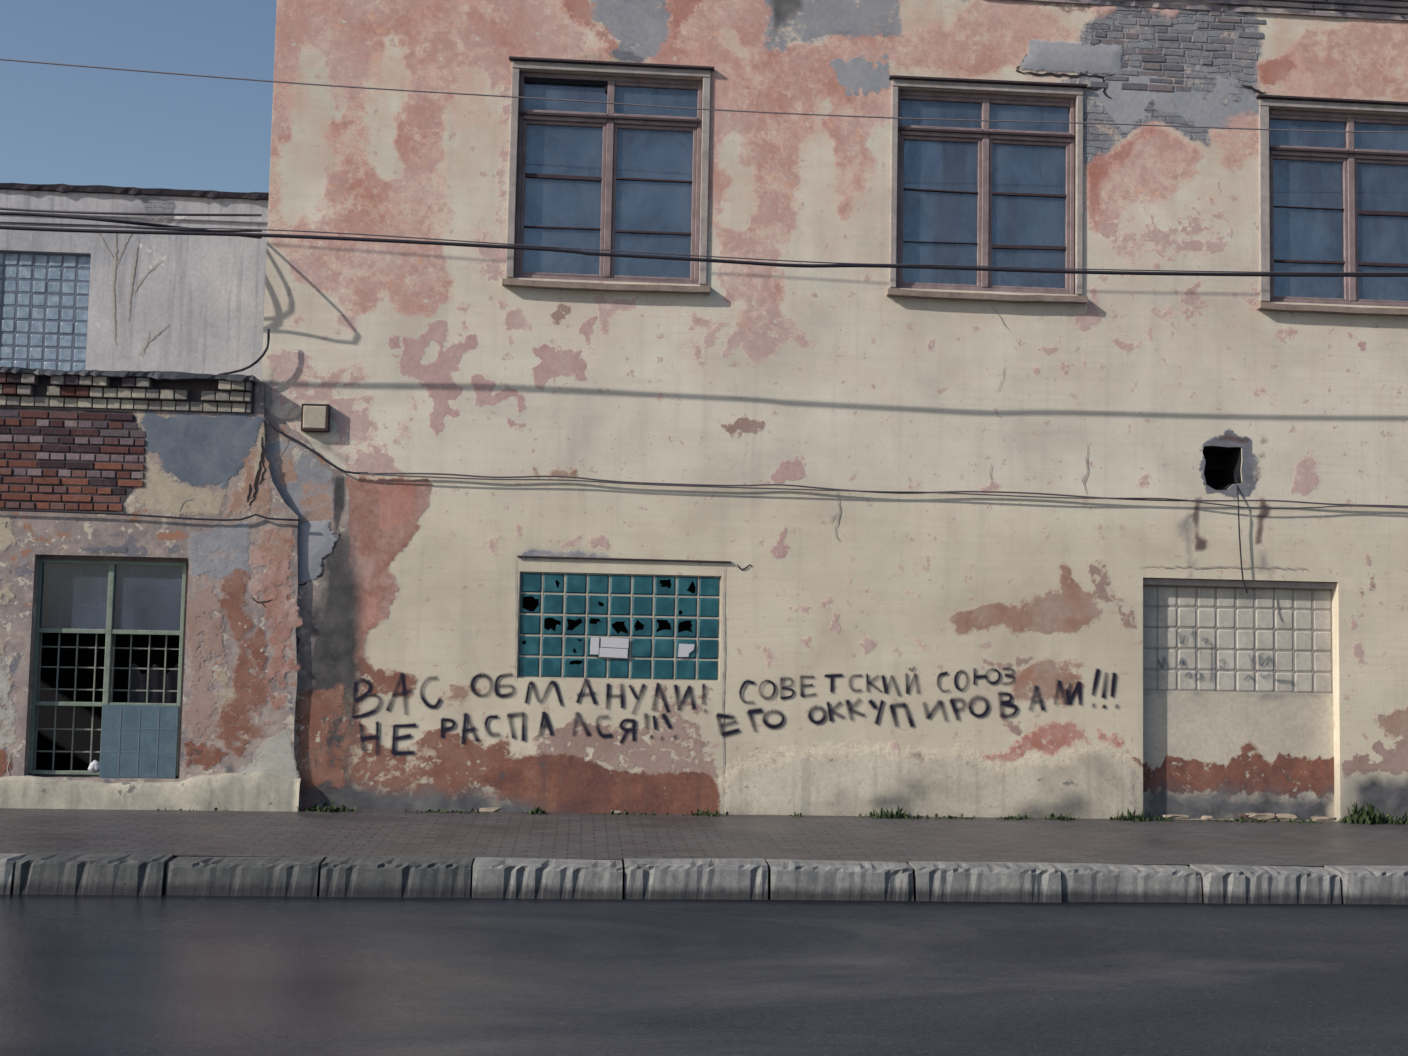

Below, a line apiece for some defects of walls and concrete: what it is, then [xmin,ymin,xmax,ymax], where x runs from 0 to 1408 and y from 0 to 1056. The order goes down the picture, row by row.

flaking render [141,197,175,219]
peeling [269,0,1408,437]
crack [247,404,301,506]
flaking render [1199,429,1266,497]
rust [1193,499,1206,550]
rust [1256,499,1269,543]
peeling [0,349,720,814]
peeling [950,560,1136,635]
water stain [308,477,534,812]
peeling [983,657,1408,799]
water stain [1357,778,1408,822]